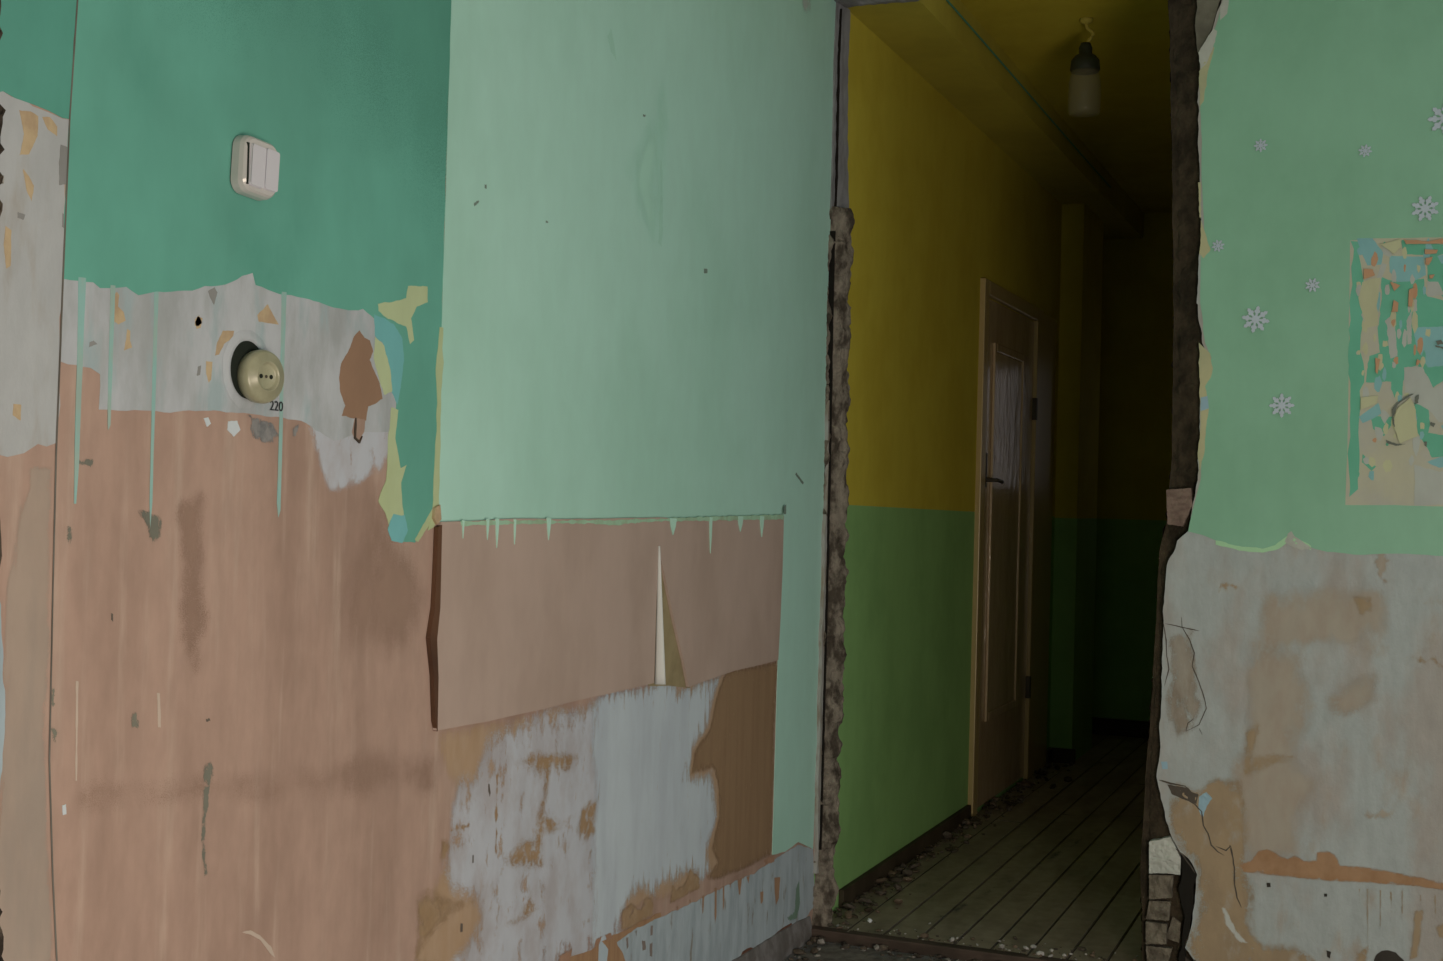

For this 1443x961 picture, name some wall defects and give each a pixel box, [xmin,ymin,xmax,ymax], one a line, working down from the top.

damp [139,491,210,675]
peeling [0,91,444,543]
spalling [416,0,919,961]
crack [1164,617,1207,731]
flaking render [1140,0,1314,961]
peeling [1345,237,1443,506]
spalling [1374,950,1404,961]